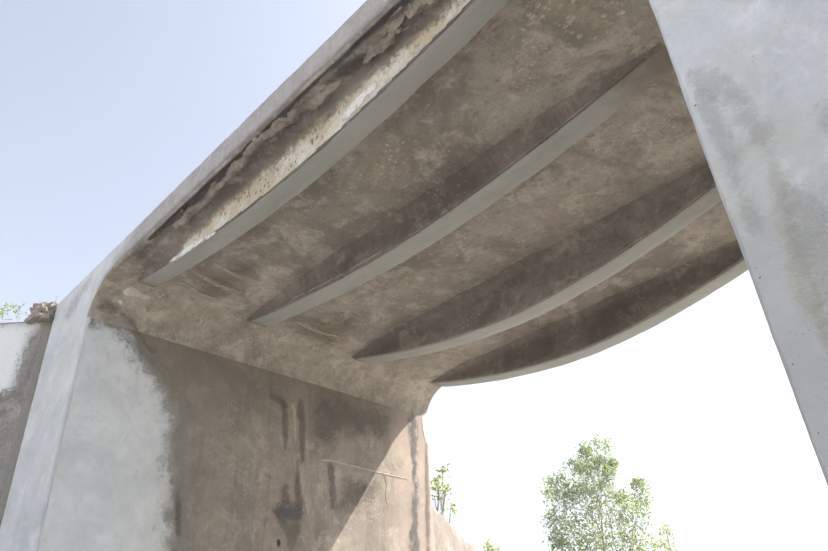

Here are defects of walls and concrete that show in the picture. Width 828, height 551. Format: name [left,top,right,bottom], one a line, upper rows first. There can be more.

spalling [363,0,449,65]
spalling [173,80,343,228]
damp [276,400,314,551]
damp [363,413,430,551]